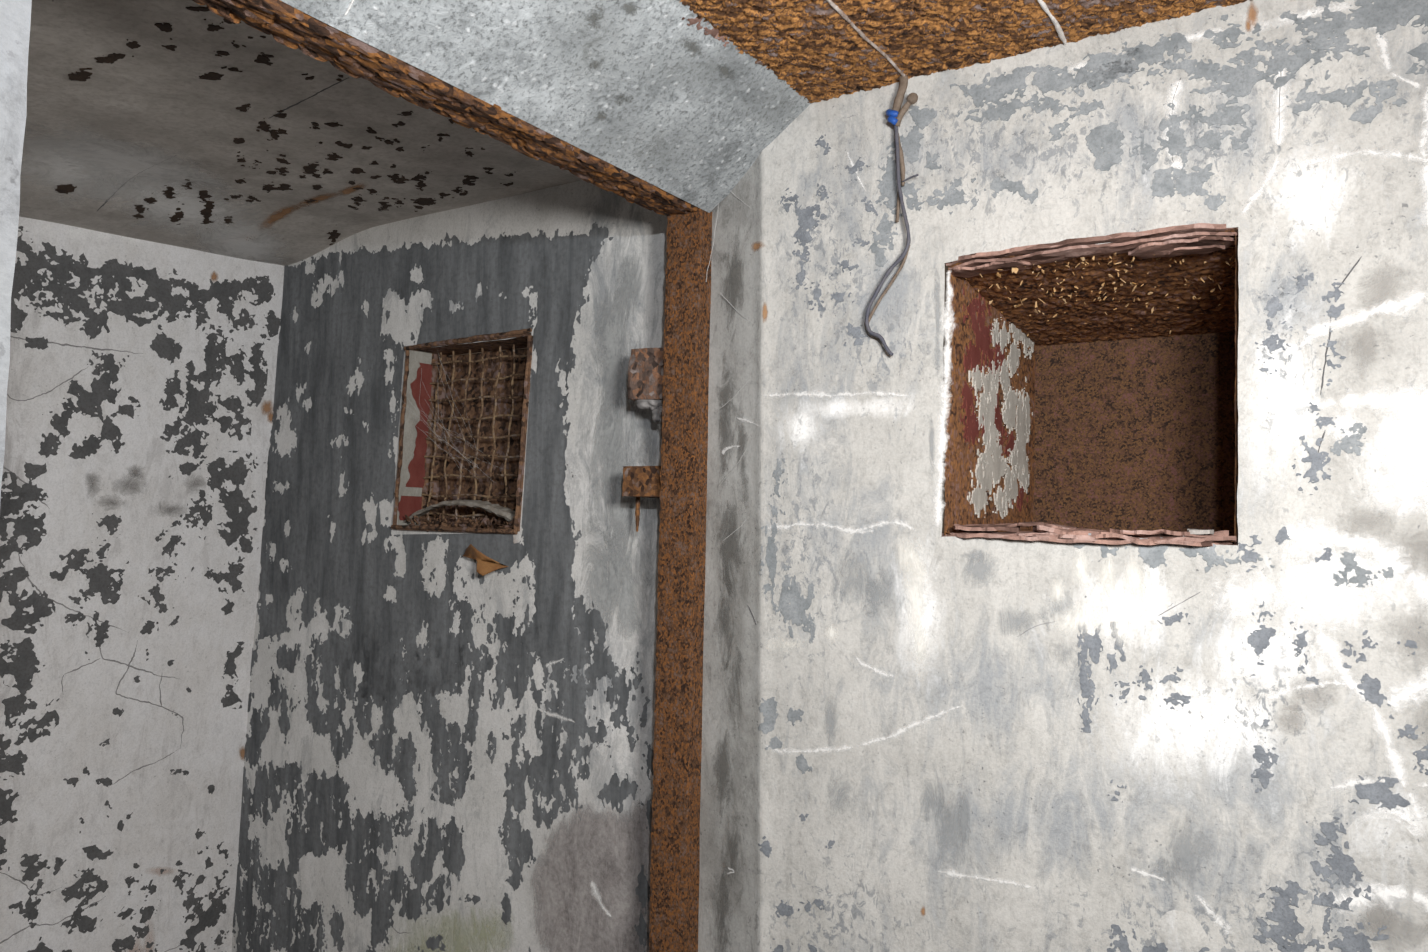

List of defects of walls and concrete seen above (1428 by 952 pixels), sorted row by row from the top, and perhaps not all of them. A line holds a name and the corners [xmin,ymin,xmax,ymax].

peeling [780,0,1428,316]
crack [1243,27,1428,222]
peeling [960,287,1034,519]
peeling [1255,269,1367,495]
leakage [1329,413,1363,439]
crack [1273,256,1428,453]
peeling [0,222,656,952]
peeling [1077,621,1191,733]
crack [1268,632,1428,819]
crack [1286,523,1428,602]
peeling [1253,775,1410,952]
crack [1327,883,1428,912]